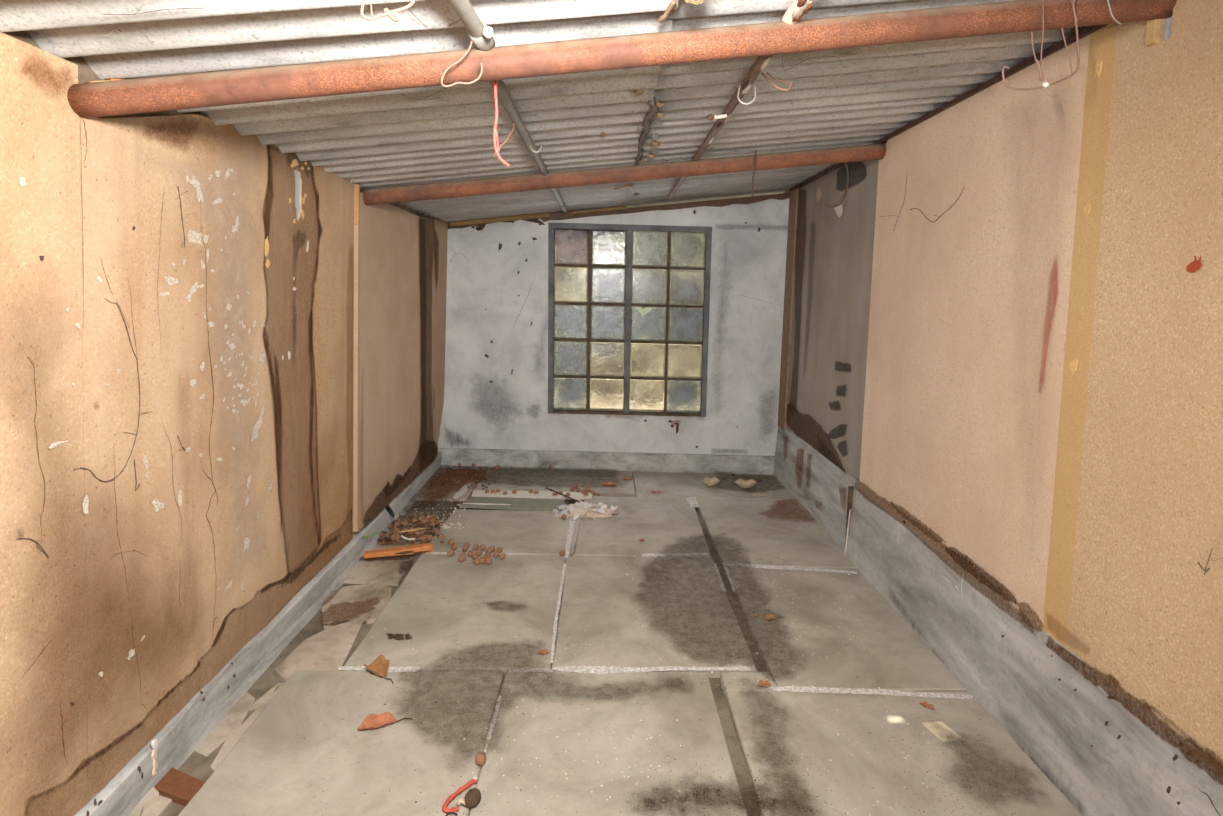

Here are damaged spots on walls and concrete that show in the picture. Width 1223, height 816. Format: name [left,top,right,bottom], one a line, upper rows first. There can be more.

crack [26,355,45,552]
damp [67,569,160,709]
damp [50,657,203,791]
crack [110,453,146,707]
crack [162,232,218,635]
peeling [442,776,478,813]
damp [388,519,973,813]
damp [786,190,1223,785]